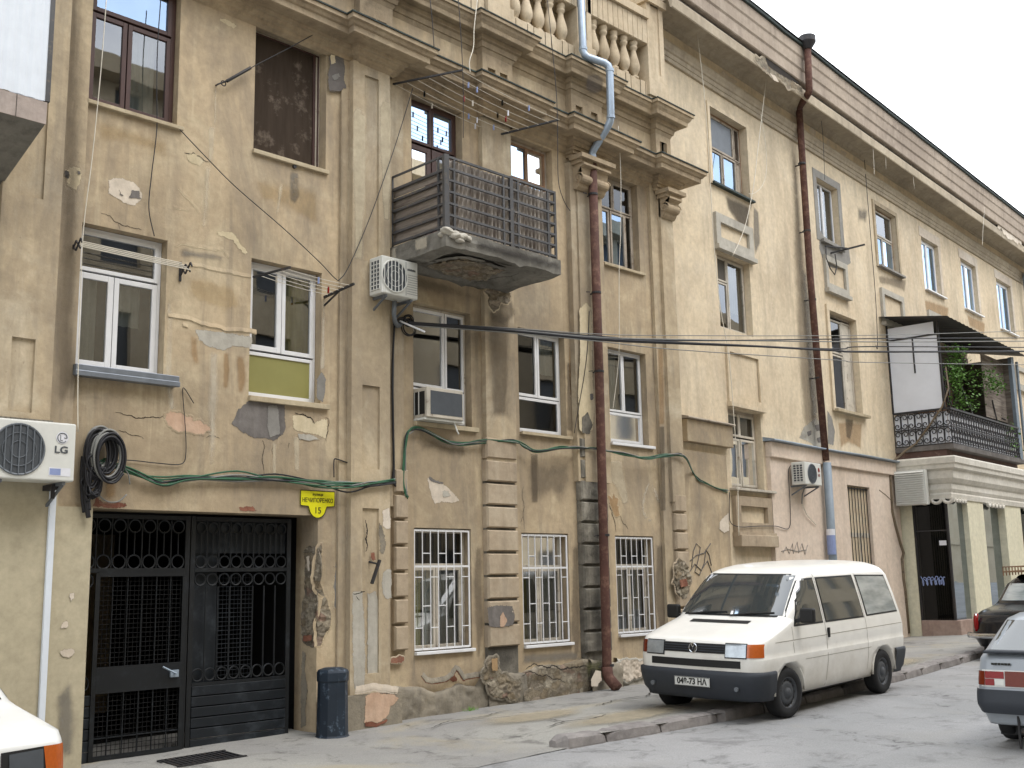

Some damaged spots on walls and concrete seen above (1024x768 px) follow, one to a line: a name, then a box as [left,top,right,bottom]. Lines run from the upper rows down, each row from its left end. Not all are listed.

peeling [328,54,346,92]
peeling [754,54,803,94]
peeling [108,178,142,205]
peeling [196,330,253,351]
flaking render [163,409,212,437]
peeling [232,401,328,441]
peeling [428,477,459,504]
flaking render [671,558,693,600]
flaking render [300,542,336,728]
peeling [352,569,405,727]
peeling [487,605,515,627]
flaking render [421,654,548,704]